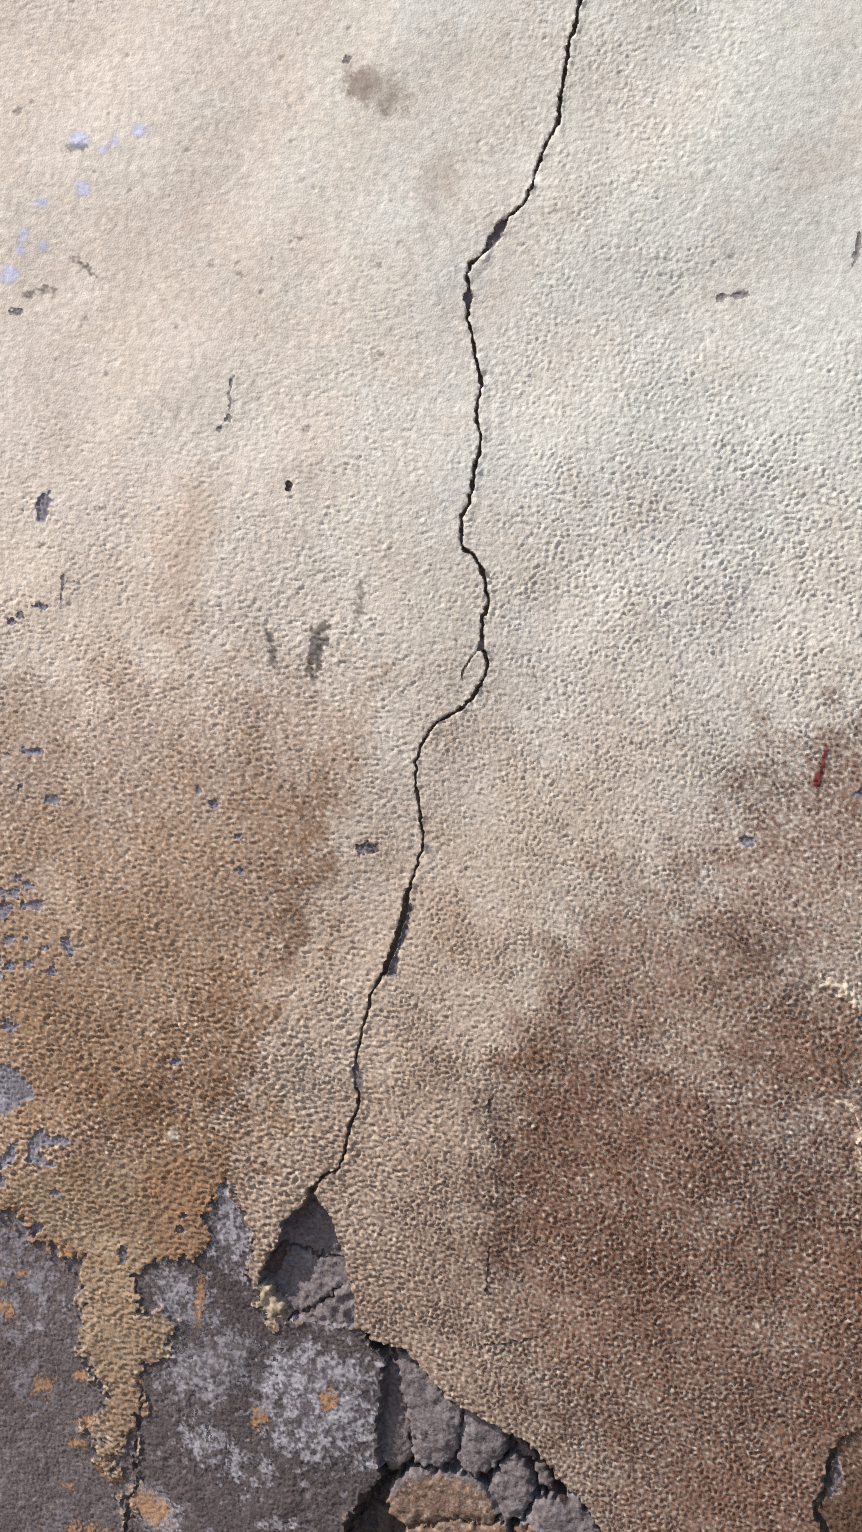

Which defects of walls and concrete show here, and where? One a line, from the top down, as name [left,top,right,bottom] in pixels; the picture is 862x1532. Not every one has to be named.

crack [310,0,583,1194]
peeling [1,1017,20,1034]
peeling [0,1063,36,1117]
peeling [0,867,76,980]
water stain [0,764,330,1474]
peeling [0,1127,601,1532]
water stain [491,922,862,1532]
flaking render [817,1443,862,1532]